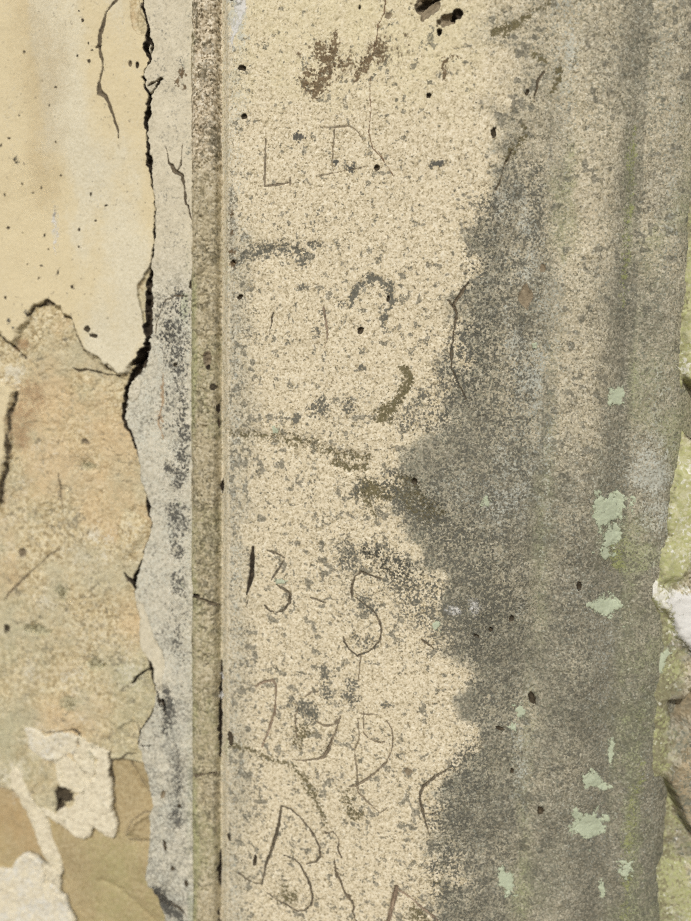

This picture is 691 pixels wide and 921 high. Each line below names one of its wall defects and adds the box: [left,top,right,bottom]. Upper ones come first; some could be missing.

water stain [531,52,563,94]
crack [26,0,192,468]
spalling [137,266,151,323]
crack [448,282,469,400]
crack [0,391,19,502]
spalling [0,303,165,921]
crack [125,497,153,612]
water stain [226,124,548,921]
water stain [551,514,593,790]
crack [36,728,81,746]
crack [106,660,166,841]